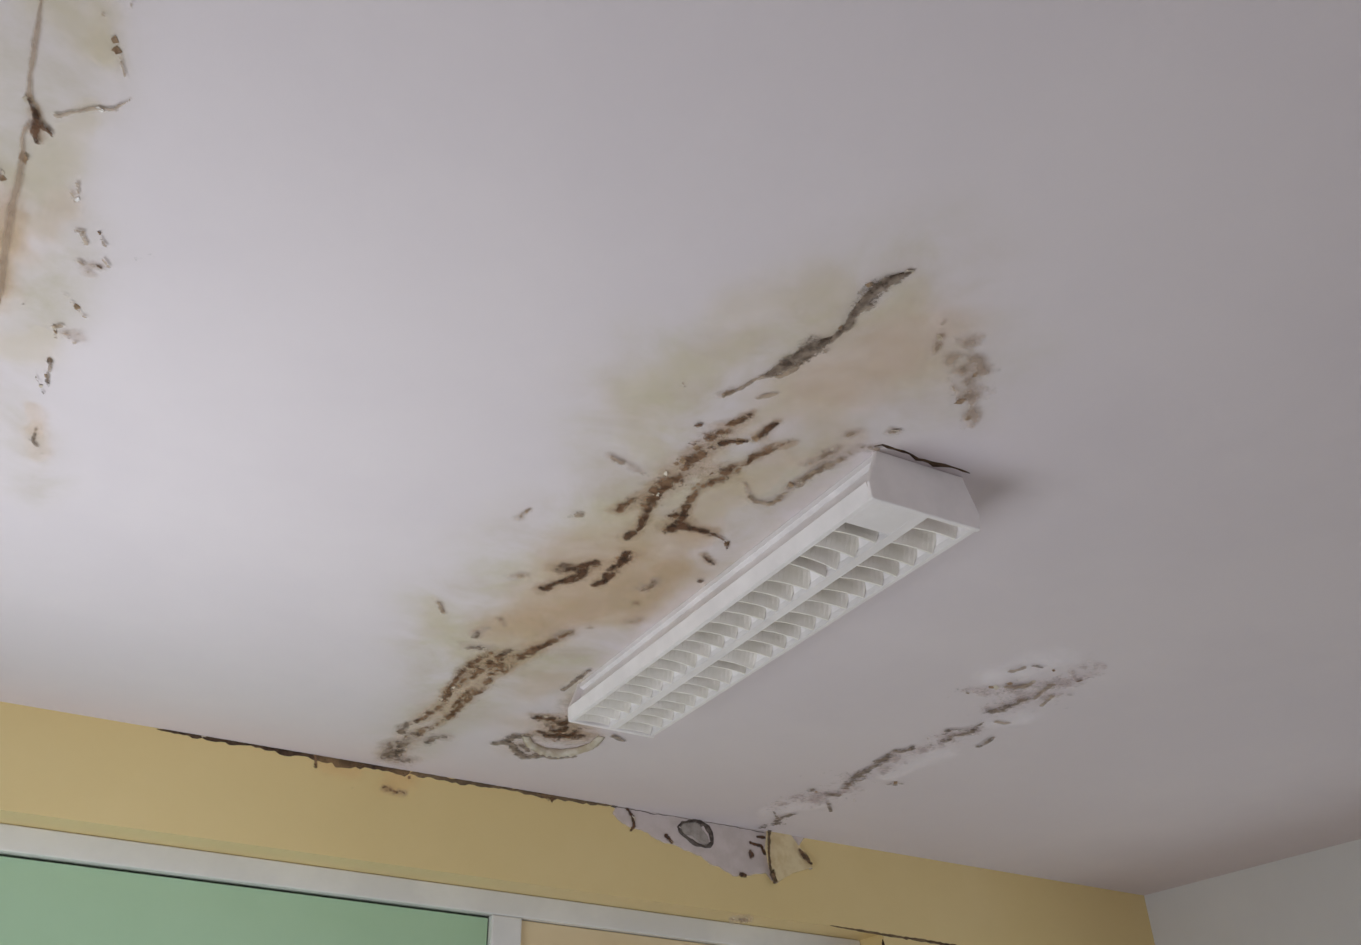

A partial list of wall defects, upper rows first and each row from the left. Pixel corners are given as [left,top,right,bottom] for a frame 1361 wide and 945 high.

crack [0,0,130,303]
leakage [0,0,225,529]
crack [722,270,914,399]
leakage [317,145,1109,771]
peeling [381,630,573,794]
flaking render [491,714,625,759]
crack [158,665,1055,833]
flaking render [613,806,813,884]
crack [830,925,956,945]